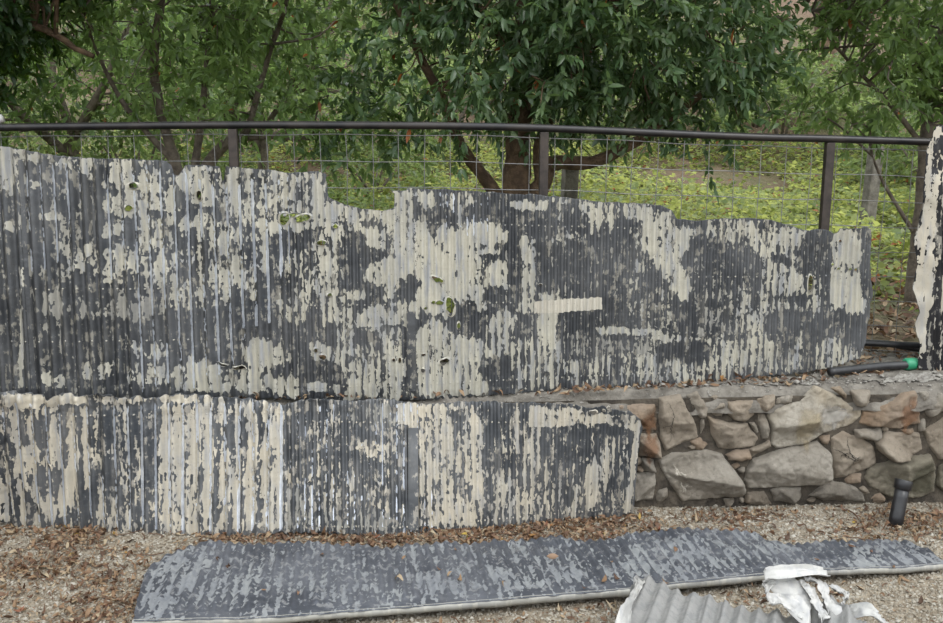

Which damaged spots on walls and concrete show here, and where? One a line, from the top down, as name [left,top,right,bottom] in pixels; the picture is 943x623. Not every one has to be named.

peeling [0,126,943,620]